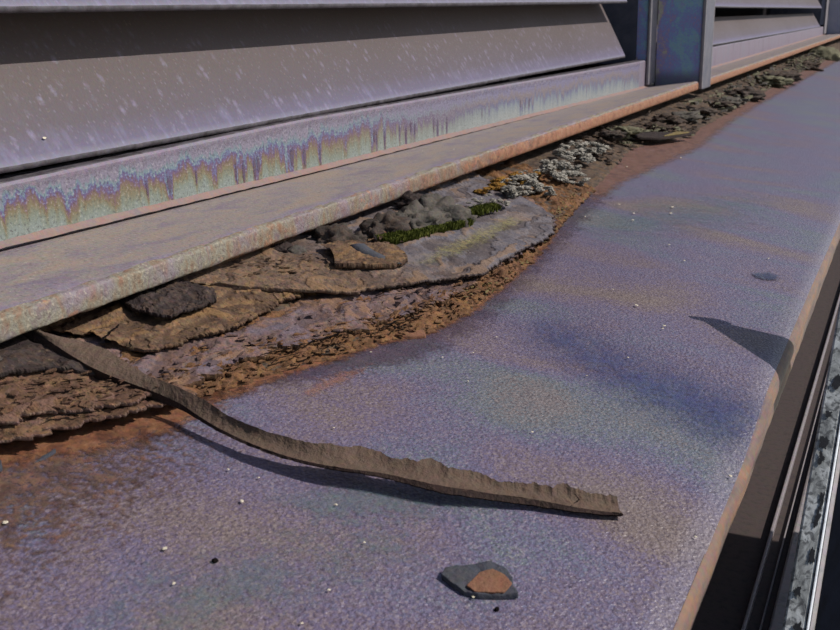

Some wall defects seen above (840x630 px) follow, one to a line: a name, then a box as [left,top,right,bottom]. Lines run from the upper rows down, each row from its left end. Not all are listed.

leakage [0,65,640,241]
corrosion [39,36,840,409]
corrosion [0,334,212,579]
peeling [22,328,624,516]
corrosion [441,561,518,600]